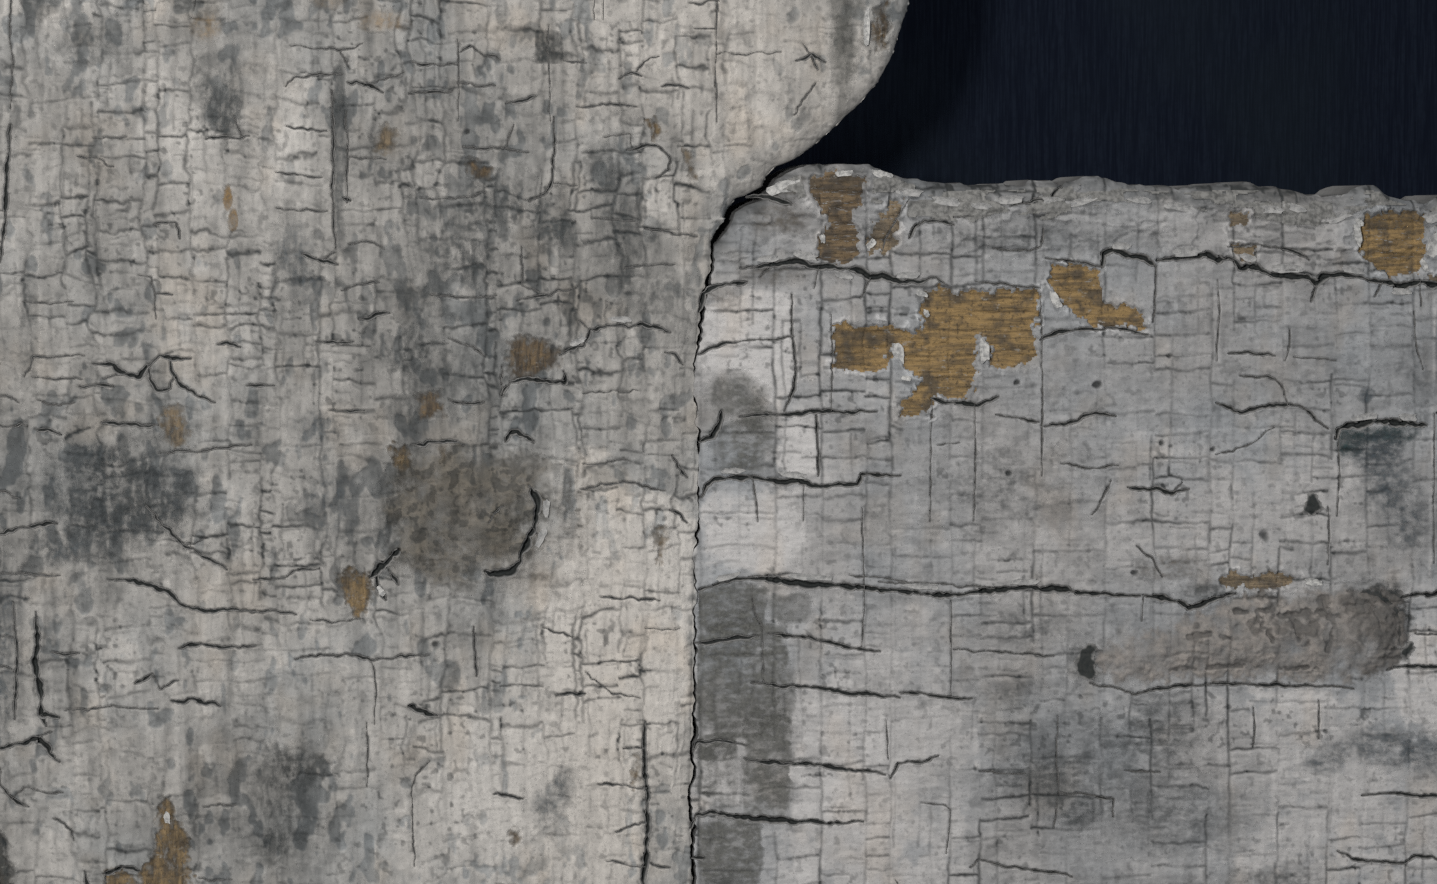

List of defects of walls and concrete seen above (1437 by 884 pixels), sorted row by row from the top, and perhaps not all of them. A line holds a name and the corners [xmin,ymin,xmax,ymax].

crack [0,0,14,263]
crack [276,0,826,344]
peeling [766,168,1437,281]
crack [0,341,252,454]
crack [434,186,1437,779]
peeling [830,263,1146,418]
peeling [1219,570,1323,591]
peeling [106,799,195,884]
crack [0,505,437,884]
crack [556,673,864,884]
water stain [696,585,790,884]
crack [1337,851,1437,865]